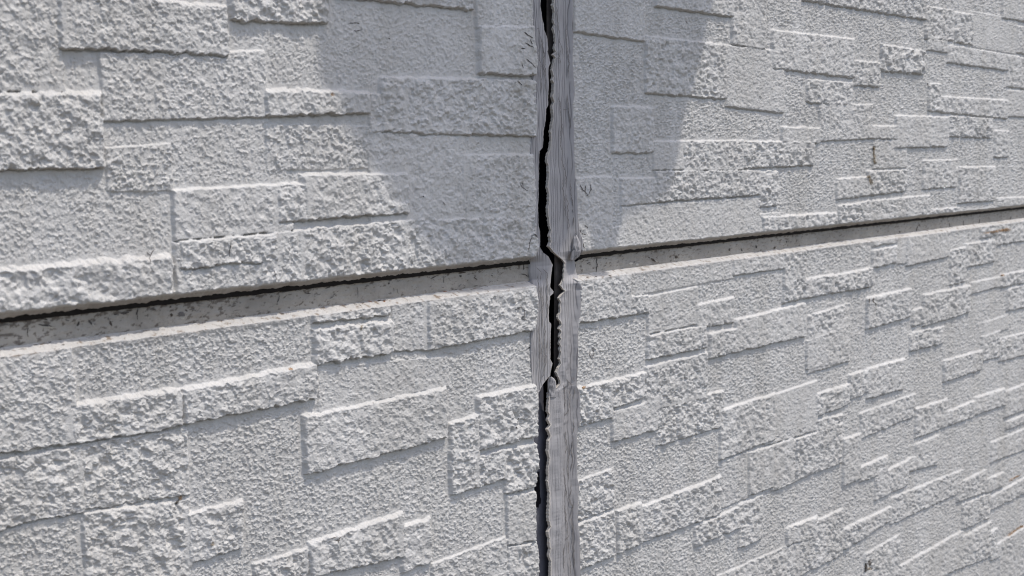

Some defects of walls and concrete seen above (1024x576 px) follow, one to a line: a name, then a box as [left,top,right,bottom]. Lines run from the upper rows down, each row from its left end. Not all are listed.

crack [515,0,598,575]